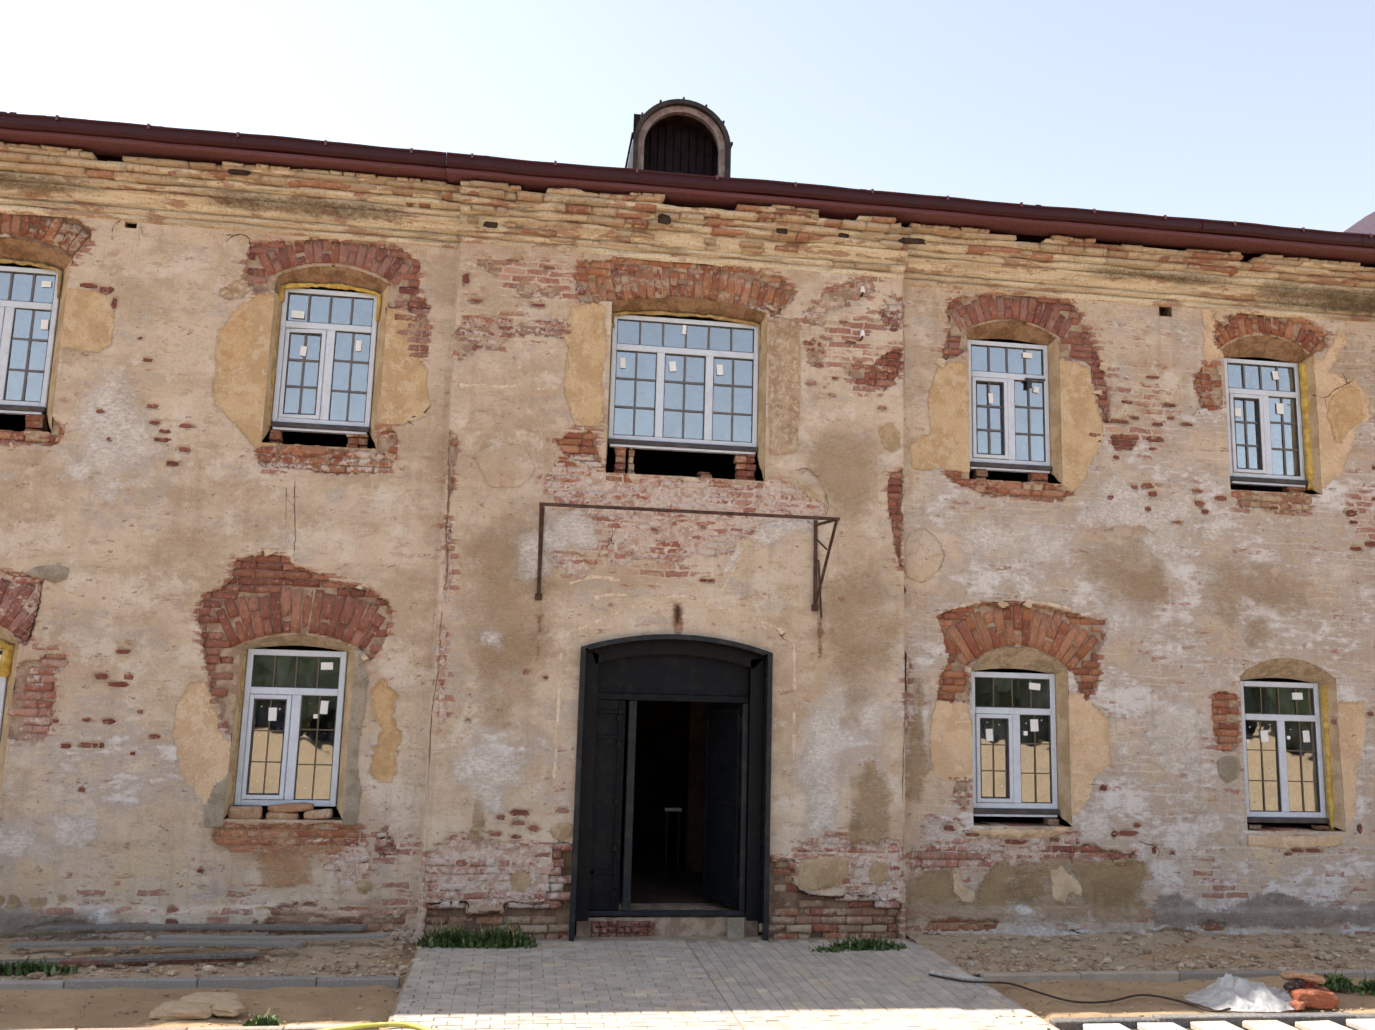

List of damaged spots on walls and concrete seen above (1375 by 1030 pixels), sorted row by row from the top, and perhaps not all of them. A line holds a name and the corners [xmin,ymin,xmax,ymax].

peeling [212,236,431,476]
peeling [455,257,1370,600]
water stain [962,520,1070,600]
water stain [1081,475,1223,559]
spalling [147,548,392,804]
spalling [759,599,1177,939]
spalling [1212,691,1242,752]
water stain [0,815,97,862]
water stain [0,894,97,940]
spalling [248,809,572,939]
water stain [905,822,1375,937]
water stain [1170,813,1224,857]